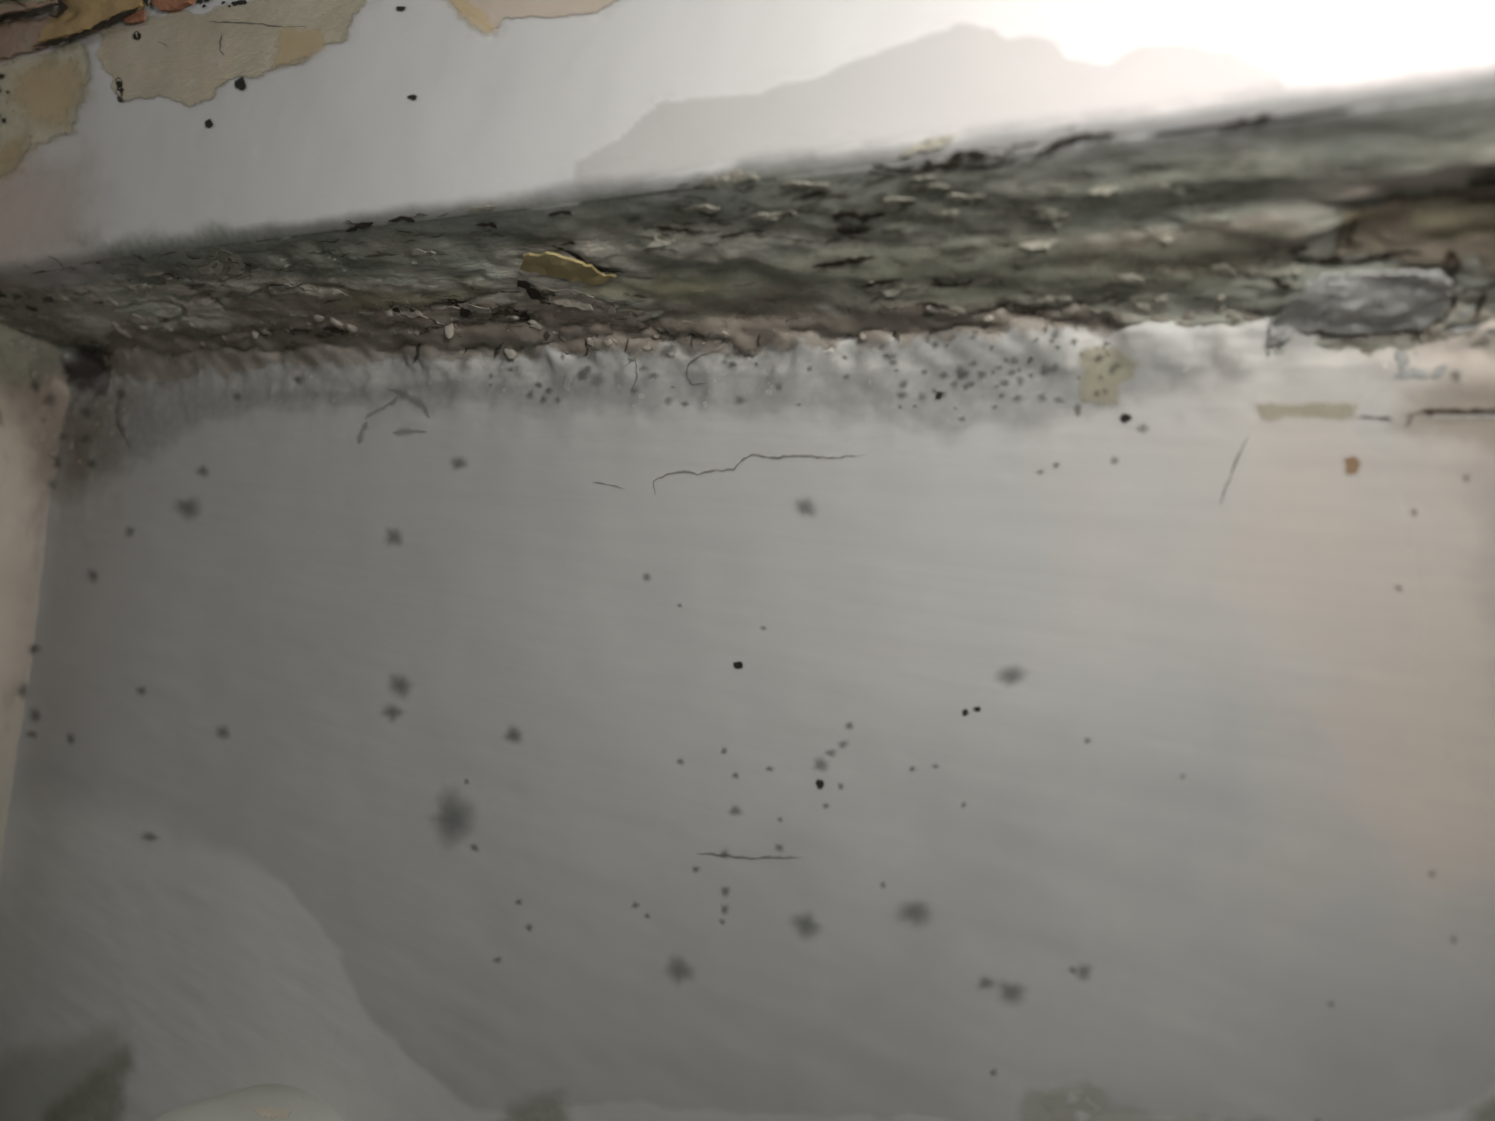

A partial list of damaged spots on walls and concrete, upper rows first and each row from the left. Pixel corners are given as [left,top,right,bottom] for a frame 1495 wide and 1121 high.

spalling [0,0,366,107]
peeling [463,0,615,29]
spalling [63,124,1495,389]
damp [660,235,1283,352]
crack [1356,408,1495,428]
crack [595,454,861,491]